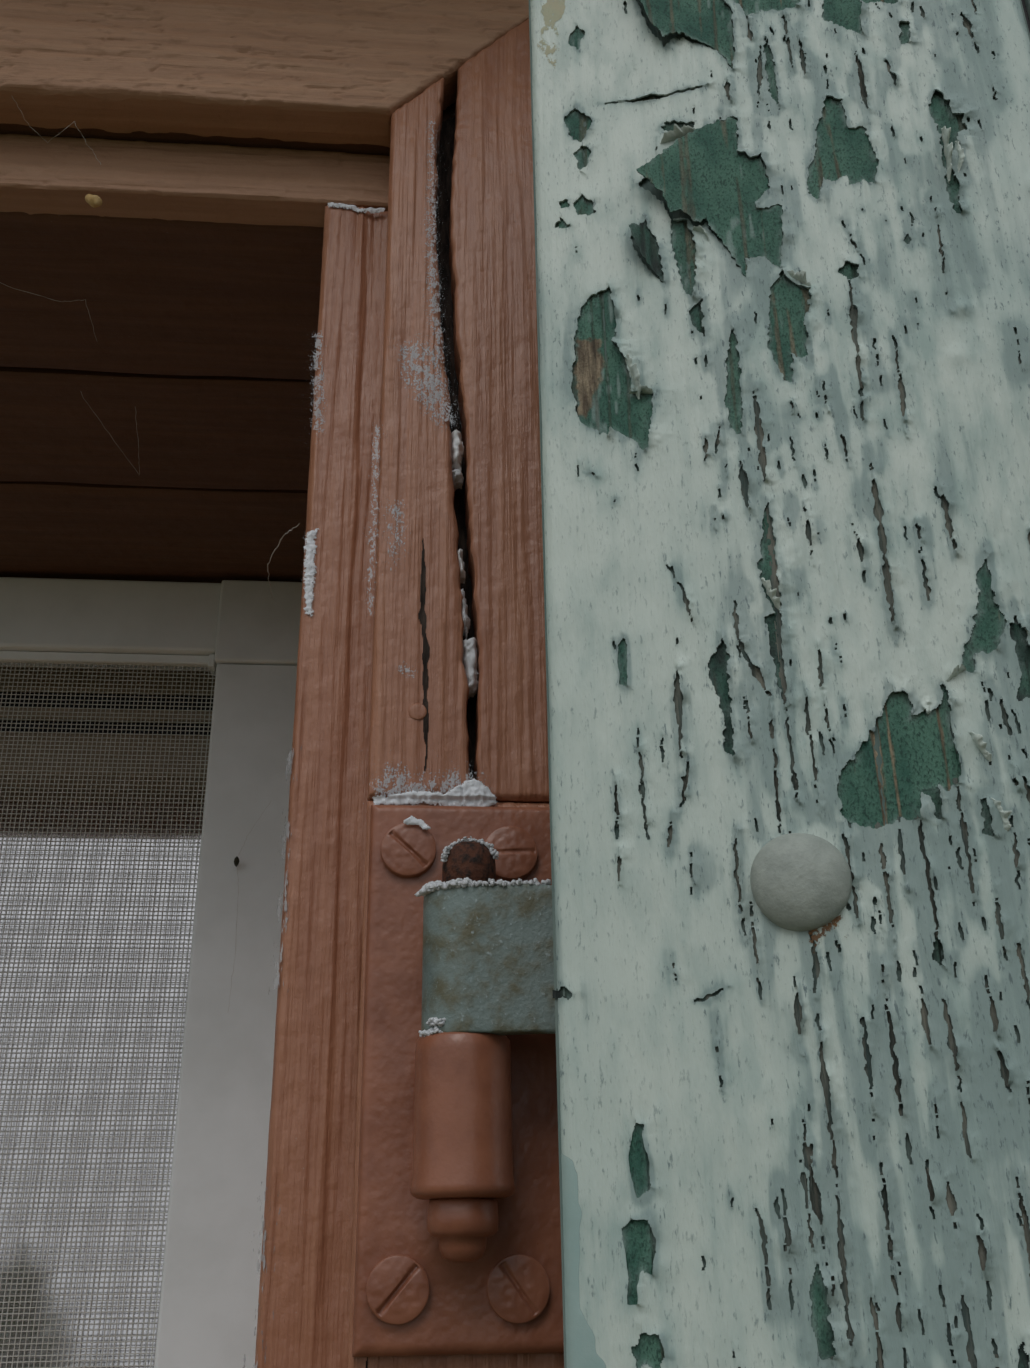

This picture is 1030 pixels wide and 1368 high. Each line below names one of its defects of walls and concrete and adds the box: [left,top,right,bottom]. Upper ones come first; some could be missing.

peeling [640,0,805,70]
peeling [822,0,919,44]
peeling [555,101,600,228]
peeling [807,94,882,200]
peeling [629,111,820,382]
peeling [571,283,655,451]
peeling [724,321,752,435]
crack [418,117,479,780]
peeling [708,632,744,762]
peeling [837,548,1030,829]
peeling [622,1118,674,1368]
peeling [809,1264,846,1367]